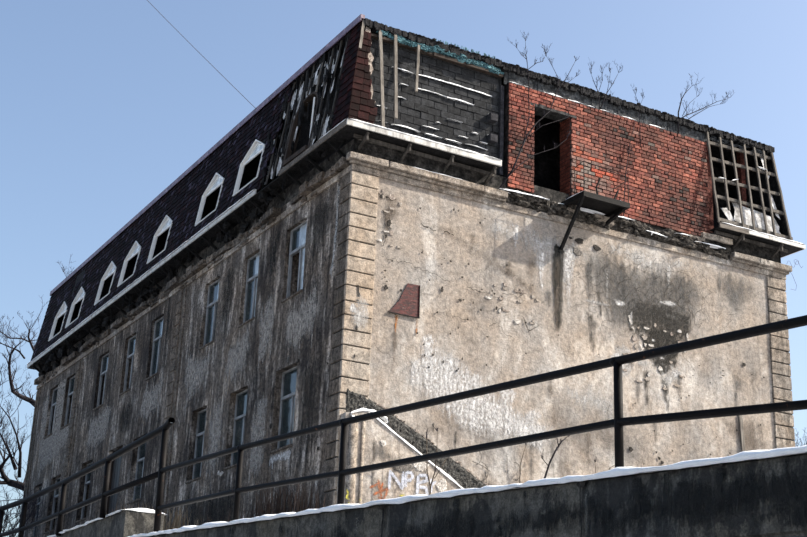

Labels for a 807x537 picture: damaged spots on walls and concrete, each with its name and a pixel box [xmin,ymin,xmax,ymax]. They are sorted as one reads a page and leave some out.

water stain [221,265,236,344]
water stain [500,226,576,329]
crack [382,218,759,371]
flaking render [569,237,584,256]
water stain [587,246,698,409]
peeling [682,232,733,245]
water stain [186,488,235,537]
water stain [387,459,807,537]